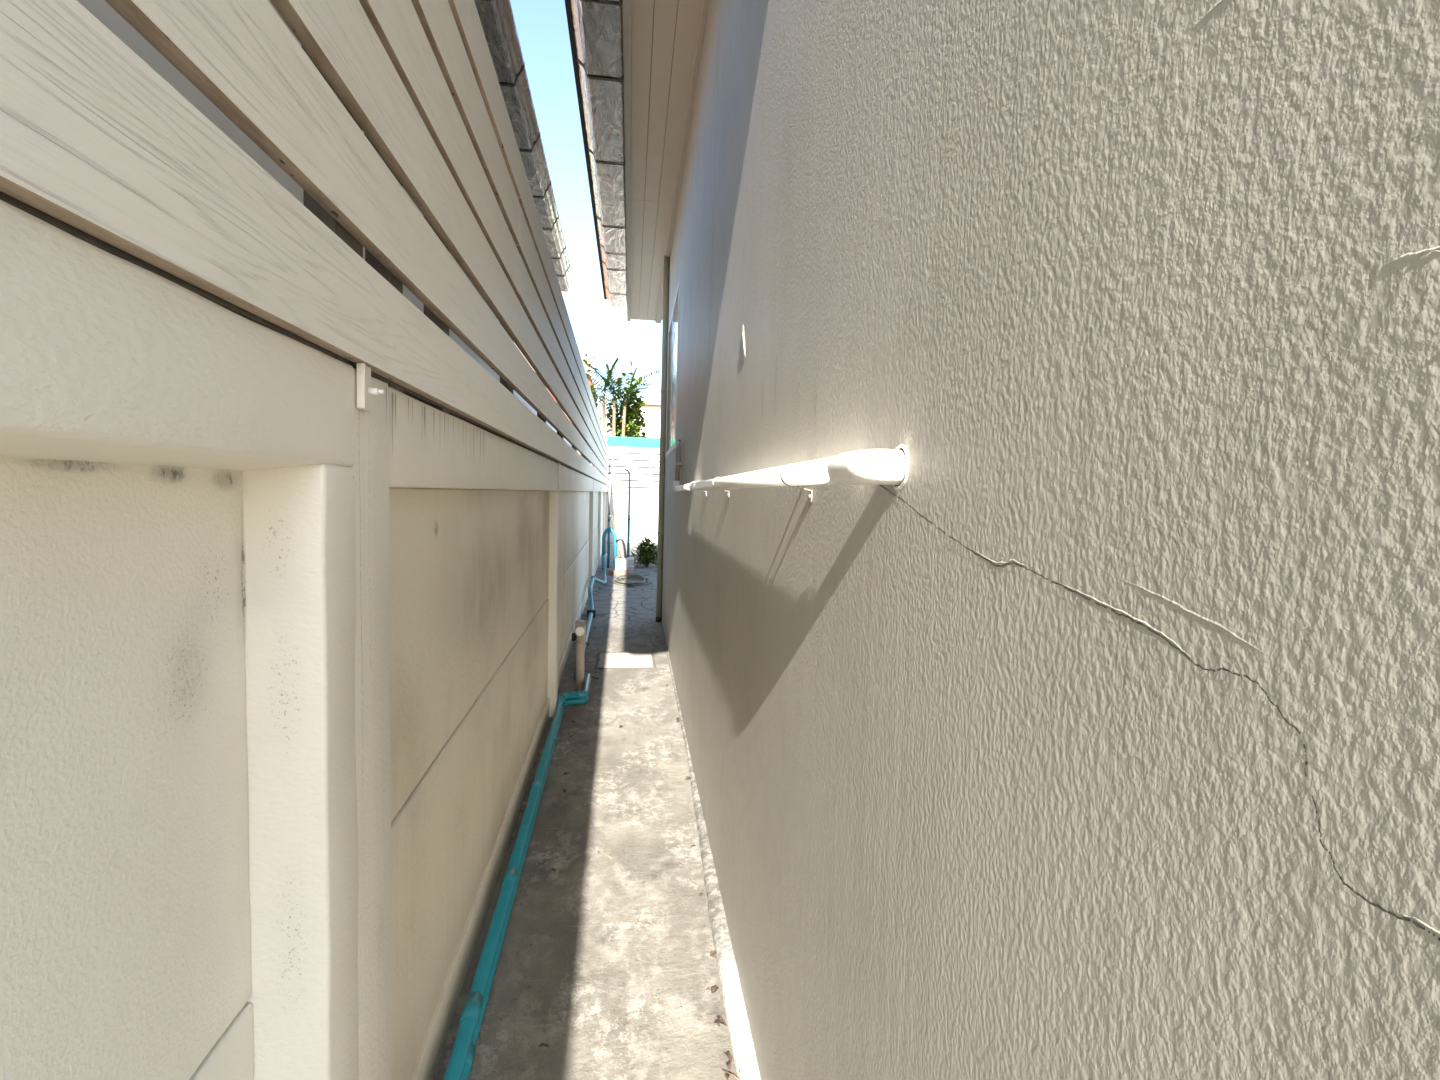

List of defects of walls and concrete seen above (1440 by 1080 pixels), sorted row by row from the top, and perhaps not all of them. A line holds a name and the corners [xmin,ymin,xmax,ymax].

crack [1297,292,1335,673]
crack [880,485,1440,1080]